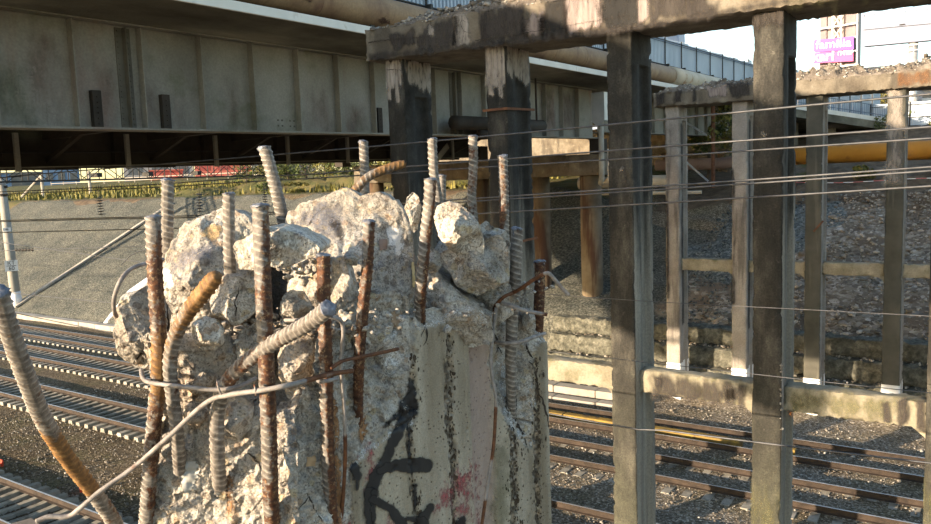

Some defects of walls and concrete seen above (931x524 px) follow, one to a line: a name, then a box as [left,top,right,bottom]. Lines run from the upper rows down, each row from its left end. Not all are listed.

leakage [369,0,667,103]
leakage [883,398,925,432]